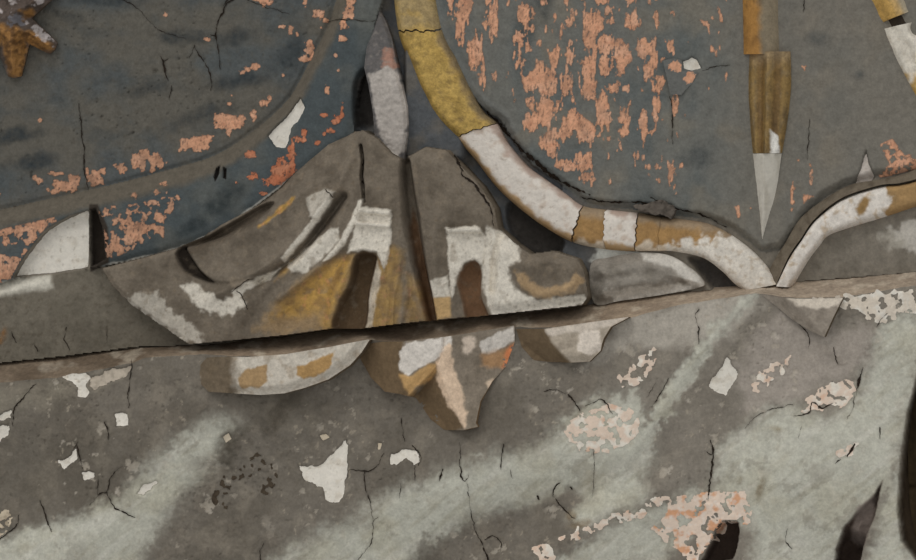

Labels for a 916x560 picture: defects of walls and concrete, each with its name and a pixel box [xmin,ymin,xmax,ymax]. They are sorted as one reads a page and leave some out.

crack [124,0,285,98]
peeling [32,149,167,194]
peeling [178,95,272,152]
peeling [247,99,344,196]
peeling [447,0,701,194]
flaking render [0,211,89,283]
peeling [103,181,180,258]
peeling [835,289,916,324]
flaking render [0,410,12,441]
peeling [801,379,856,413]
flaking render [300,440,348,503]
peeling [532,491,753,560]